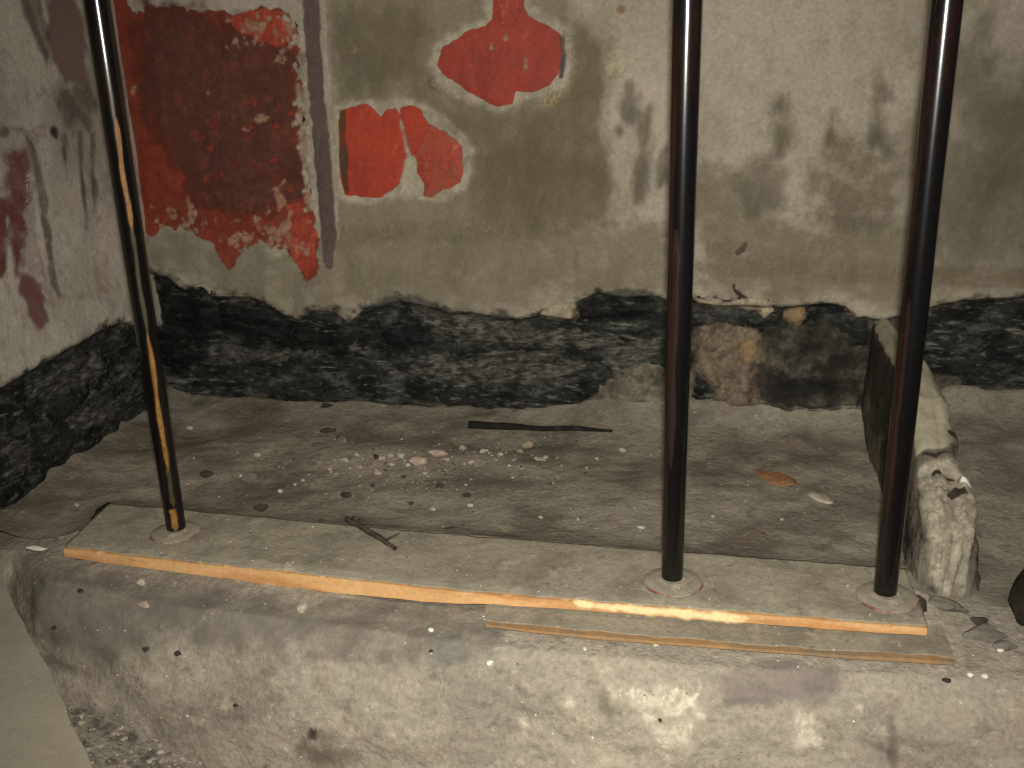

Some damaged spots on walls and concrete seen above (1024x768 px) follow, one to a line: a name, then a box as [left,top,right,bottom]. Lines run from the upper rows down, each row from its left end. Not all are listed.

peeling [428,0,579,112]
peeling [0,126,55,328]
peeling [113,0,320,281]
peeling [332,97,475,205]
water stain [618,87,667,200]
water stain [820,124,892,229]
flaking render [149,271,667,409]
spalling [690,296,872,412]